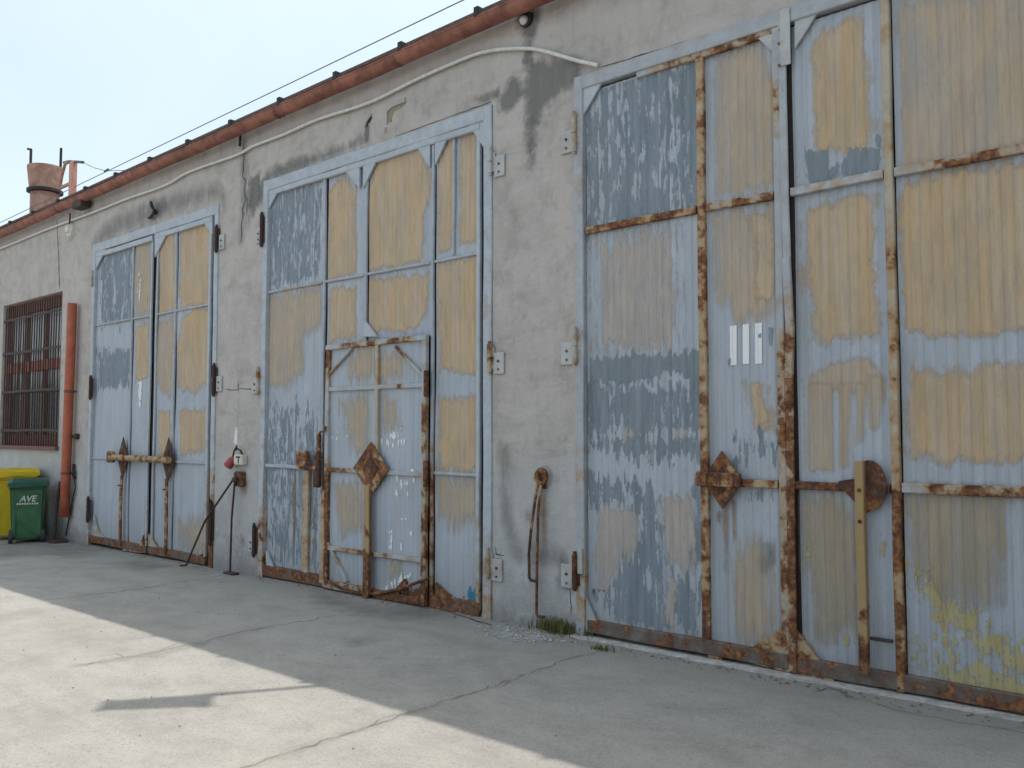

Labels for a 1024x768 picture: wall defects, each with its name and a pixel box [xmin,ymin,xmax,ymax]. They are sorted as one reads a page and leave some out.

water stain [480,8,580,146]
peeling [96,225,209,400]
crack [240,143,248,240]
peeling [269,133,477,385]
peeling [586,61,702,636]
peeling [158,409,206,456]
peeling [385,517,412,593]
peeling [905,558,1024,694]